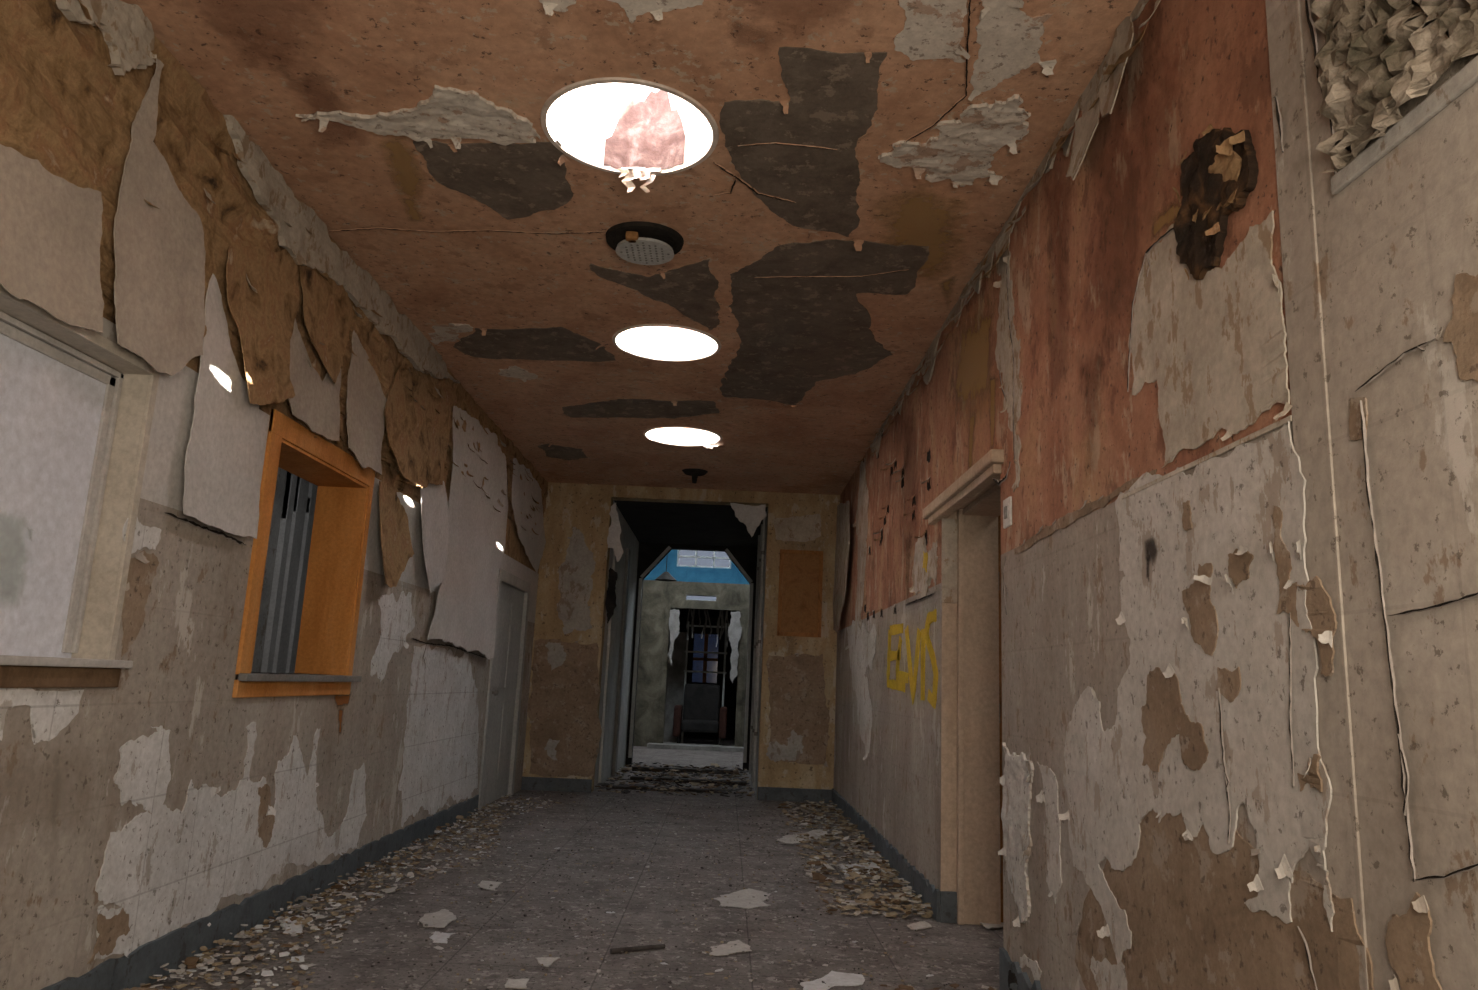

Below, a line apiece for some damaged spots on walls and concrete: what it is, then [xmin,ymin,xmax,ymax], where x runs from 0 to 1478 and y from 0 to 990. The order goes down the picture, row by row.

spalling [0,0,616,827]
spalling [562,0,1057,419]
peeling [980,211,1443,990]
spalling [1192,124,1245,236]
crack [1355,339,1478,882]
peeling [87,722,367,964]
peeling [535,957,560,967]
crack [1297,926,1318,990]